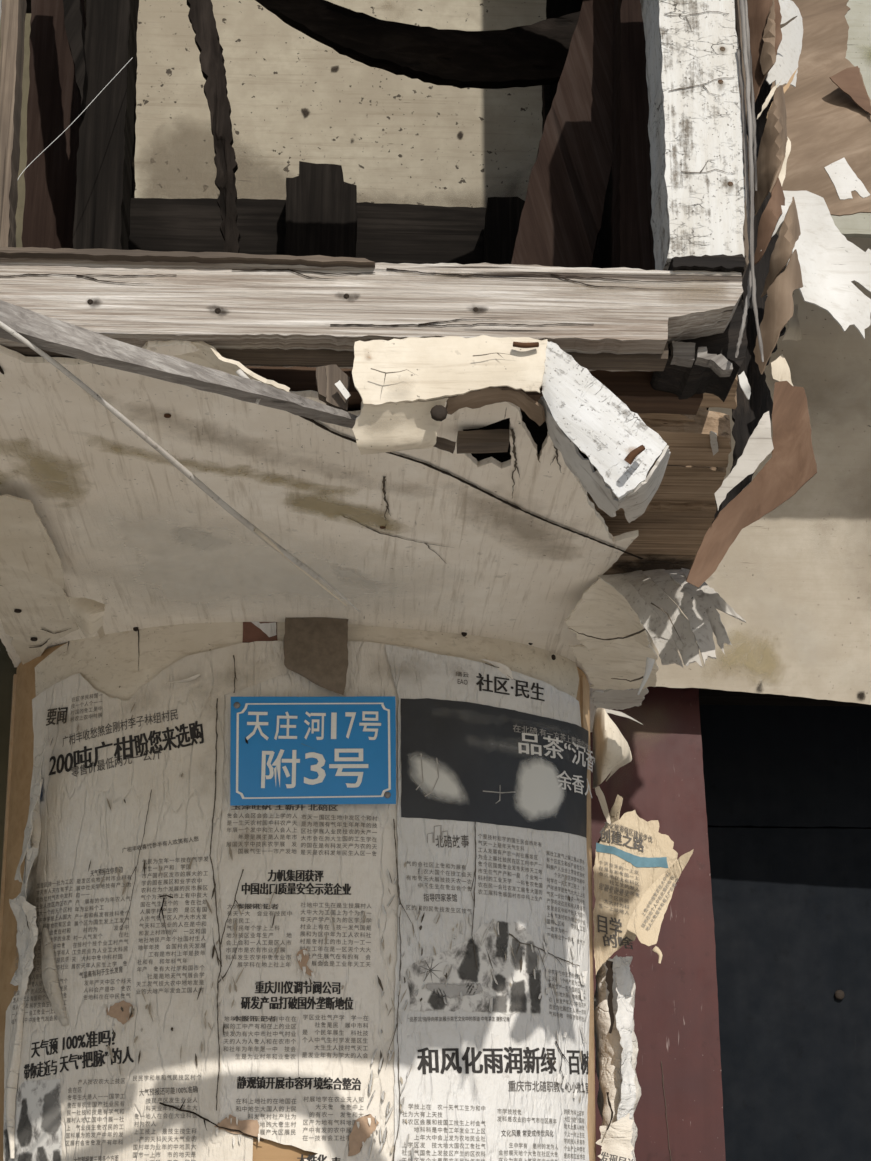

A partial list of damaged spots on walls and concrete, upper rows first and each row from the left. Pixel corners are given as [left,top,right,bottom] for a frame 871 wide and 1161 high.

peeling [747,0,803,386]
crack [385,819,417,1161]